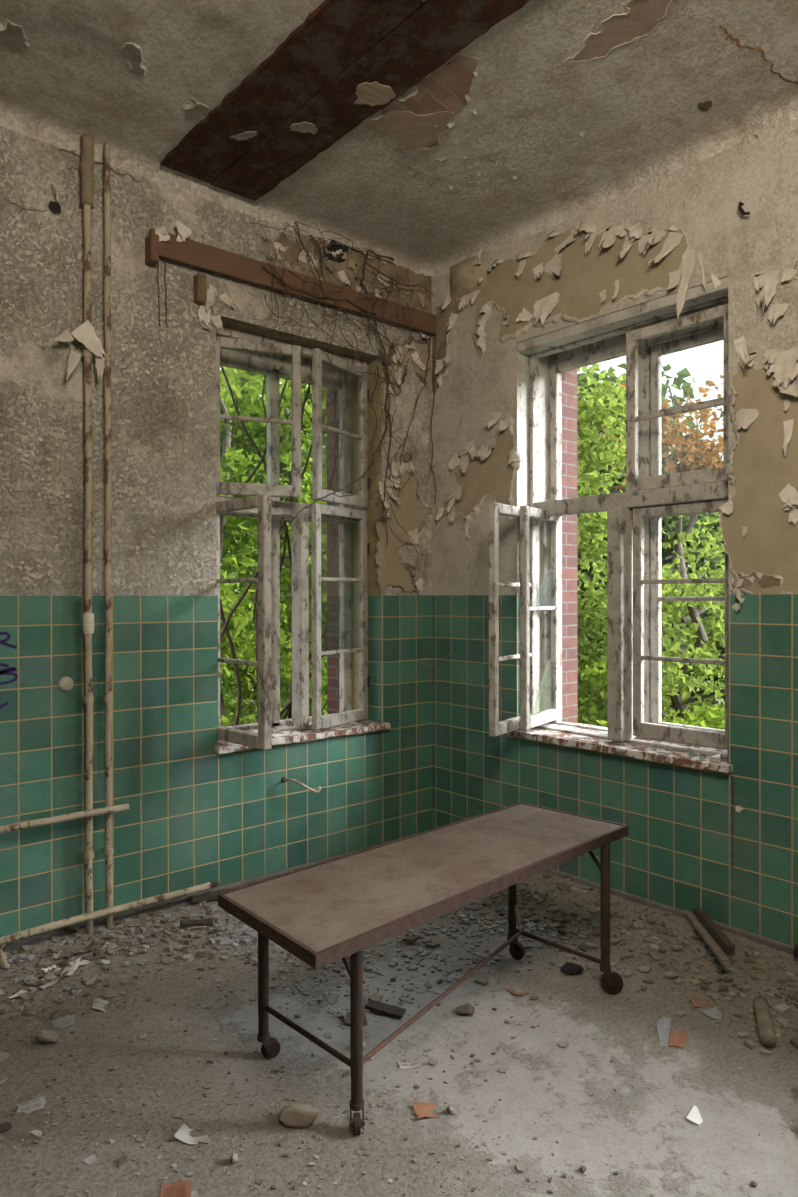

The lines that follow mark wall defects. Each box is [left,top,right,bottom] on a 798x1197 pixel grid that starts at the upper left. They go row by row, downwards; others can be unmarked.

flaking render [354,51,479,152]
peeling [562,0,674,67]
crack [719,25,798,84]
peeling [259,220,721,396]
peeling [752,260,798,325]
peeling [374,412,521,596]
peeling [719,336,798,612]